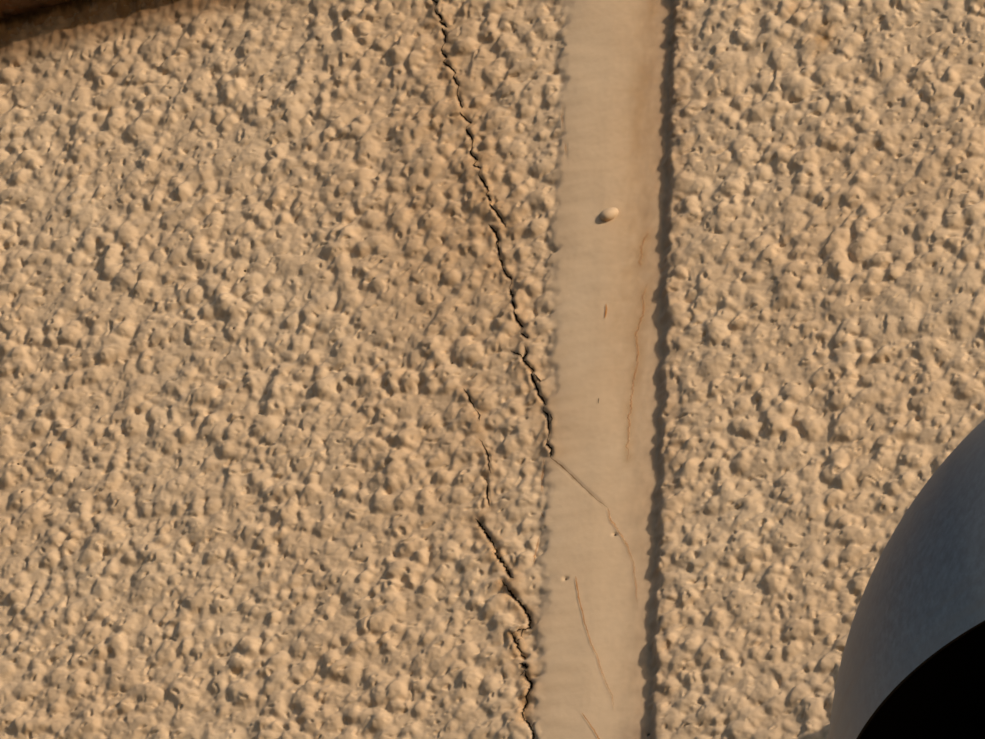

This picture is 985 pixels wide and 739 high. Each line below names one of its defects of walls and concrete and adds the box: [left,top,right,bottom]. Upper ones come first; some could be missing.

crack [432,0,616,739]